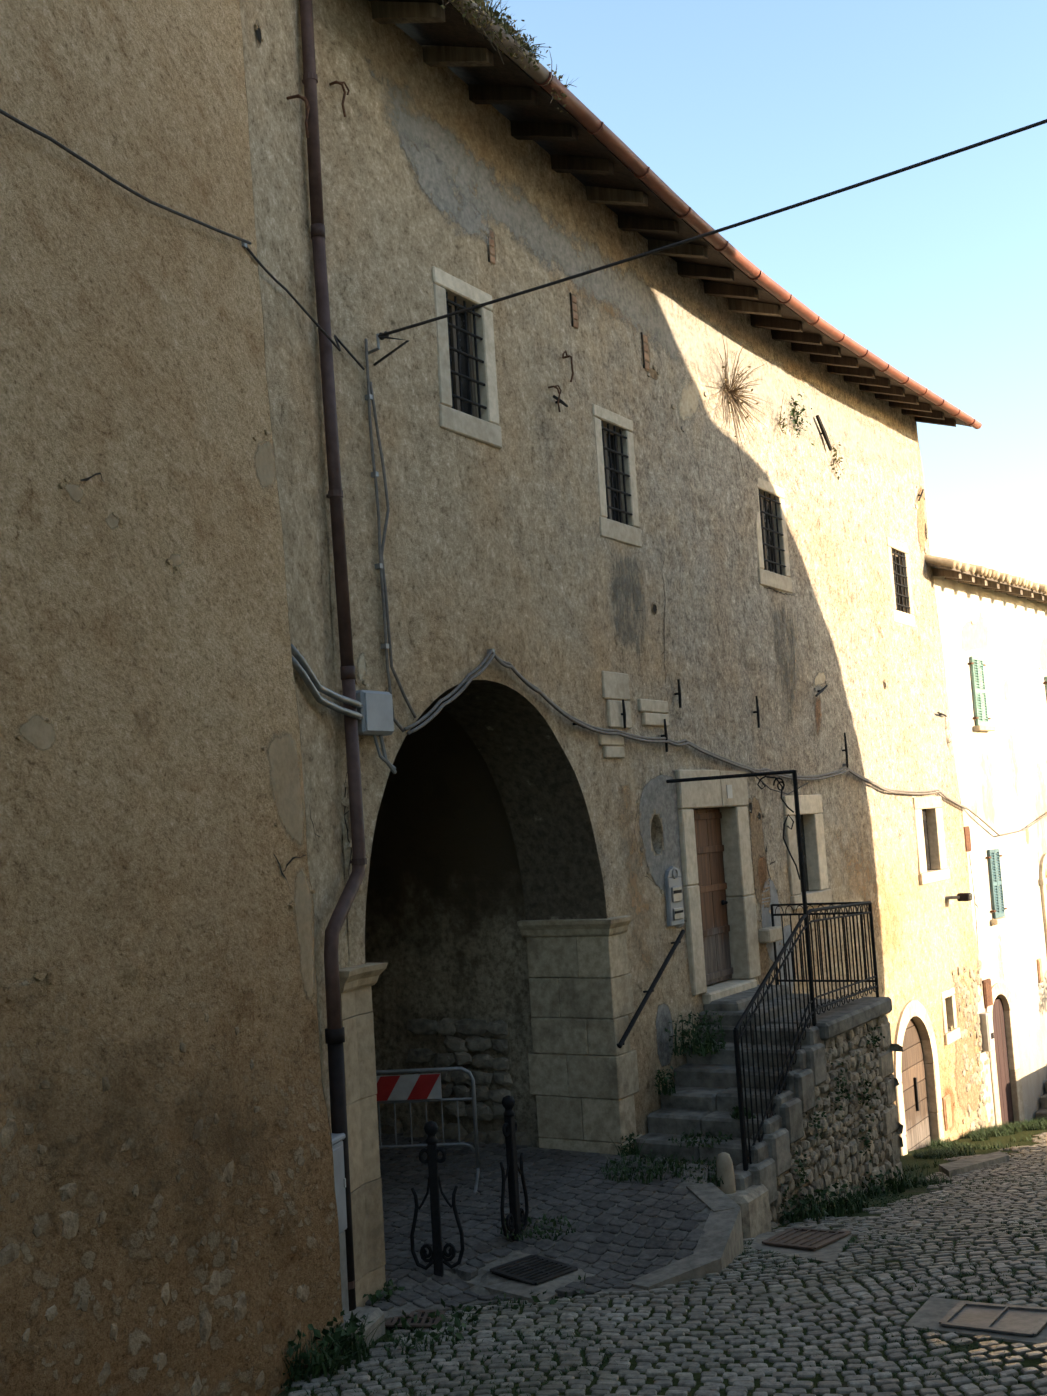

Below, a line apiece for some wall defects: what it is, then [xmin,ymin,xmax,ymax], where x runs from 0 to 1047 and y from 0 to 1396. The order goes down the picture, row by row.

flaking render [59,1183,79,1239]